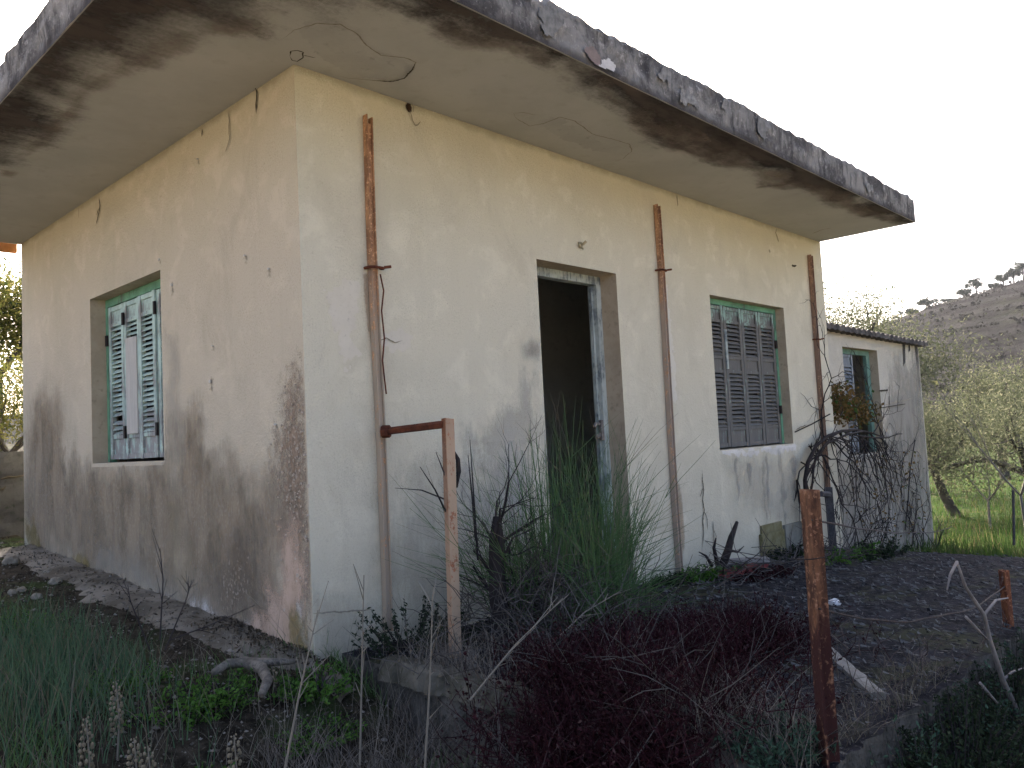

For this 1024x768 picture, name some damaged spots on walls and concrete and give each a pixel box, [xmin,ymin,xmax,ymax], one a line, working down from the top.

damp [0,0,257,145]
damp [392,0,915,224]
spalling [658,65,699,109]
damp [26,403,287,623]